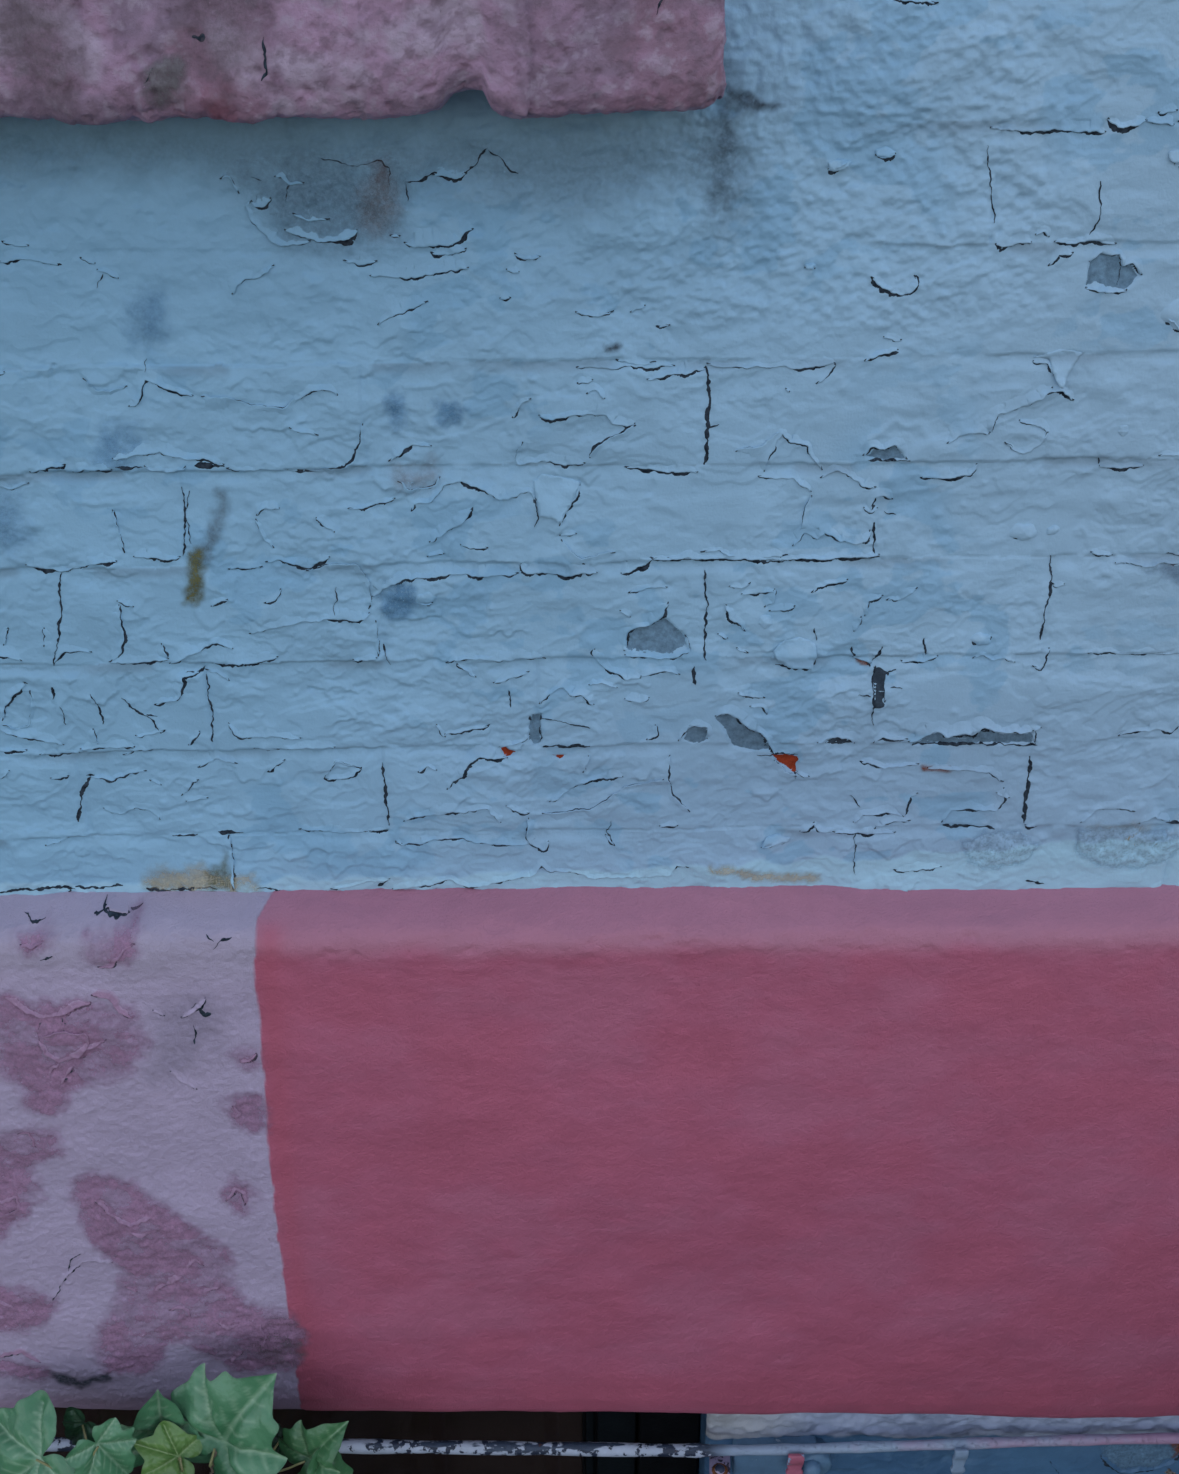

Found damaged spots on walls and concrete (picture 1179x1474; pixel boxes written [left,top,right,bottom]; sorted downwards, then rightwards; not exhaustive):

peeling [990,103,1179,135]
crack [321,149,518,200]
peeling [220,169,474,326]
peeling [995,225,1143,295]
crack [181,487,191,555]
peeling [109,597,279,706]
peeling [228,376,918,890]
crack [702,571,710,660]
crack [1040,555,1065,640]
peeling [817,587,1050,823]
crack [51,687,166,822]
crack [1021,756,1037,830]